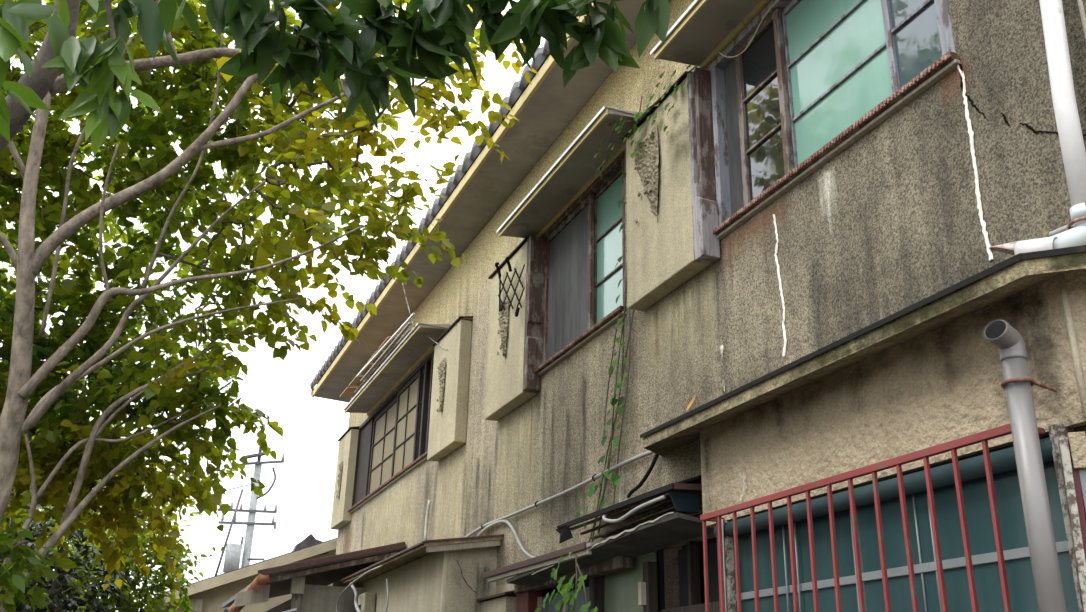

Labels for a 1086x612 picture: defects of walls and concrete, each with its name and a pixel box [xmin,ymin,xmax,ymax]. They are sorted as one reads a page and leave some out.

spalling [633,127,661,223]
crack [957,58,1086,260]